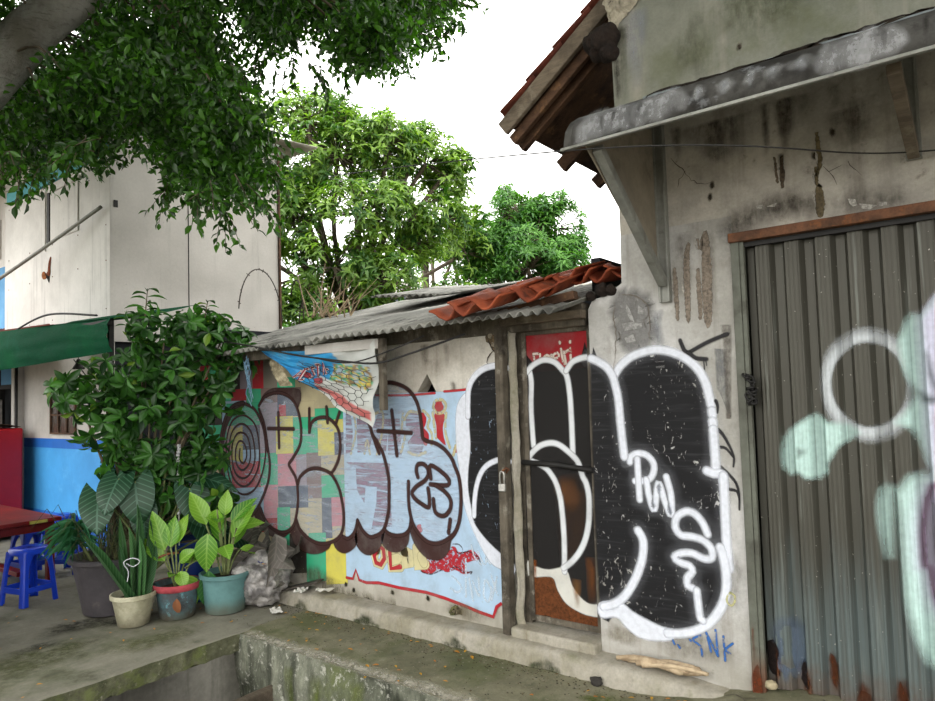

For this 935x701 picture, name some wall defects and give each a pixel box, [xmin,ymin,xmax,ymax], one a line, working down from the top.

spalling [602,0,638,28]
peeling [773,157,785,188]
peeling [812,132,825,218]
water stain [767,197,811,213]
peeling [672,230,713,328]
corrosion [752,665,763,693]
corrosion [830,653,839,686]
corrosion [898,682,908,701]